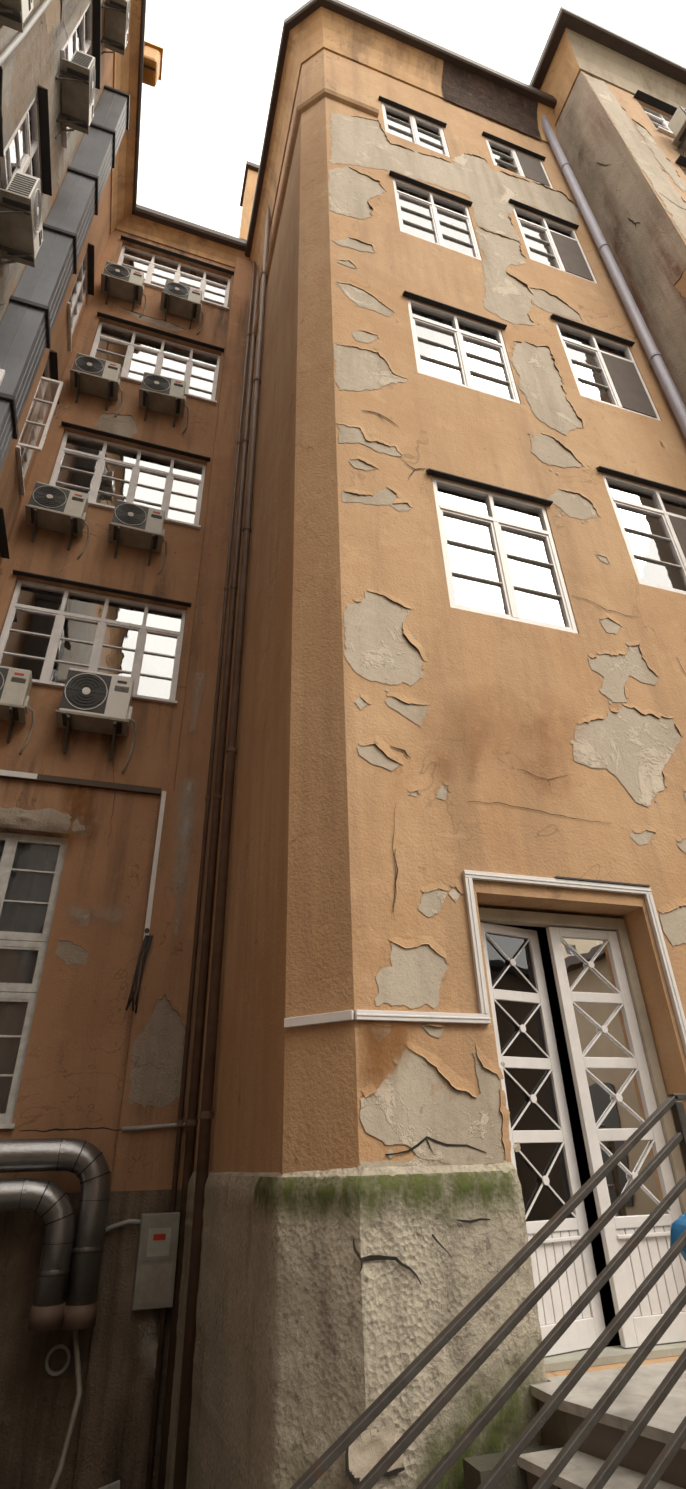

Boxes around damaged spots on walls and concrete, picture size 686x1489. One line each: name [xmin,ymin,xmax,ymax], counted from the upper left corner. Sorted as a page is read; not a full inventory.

flaking render [328,113,602,523]
flaking render [343,589,430,727]
flaking render [570,613,686,845]
crack [391,805,399,919]
flaking render [418,877,465,917]
flaking render [360,935,521,1168]
crack [353,1239,422,1285]
crack [431,1218,490,1257]